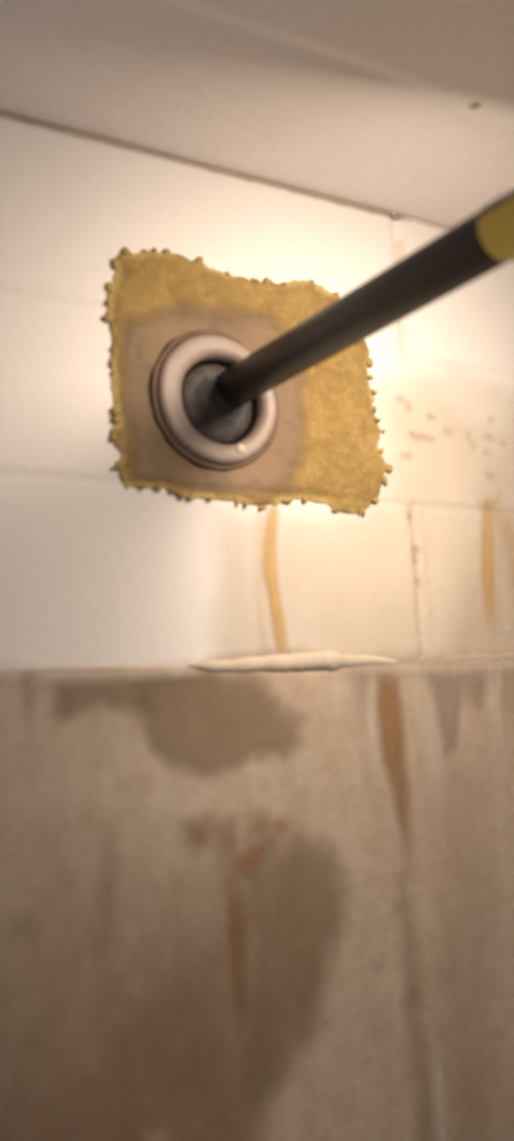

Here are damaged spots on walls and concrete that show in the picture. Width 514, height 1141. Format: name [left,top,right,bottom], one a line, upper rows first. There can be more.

corrosion [266,508,285,649]
corrosion [484,519,492,596]
damp [64,676,296,770]
corrosion [381,665,404,800]